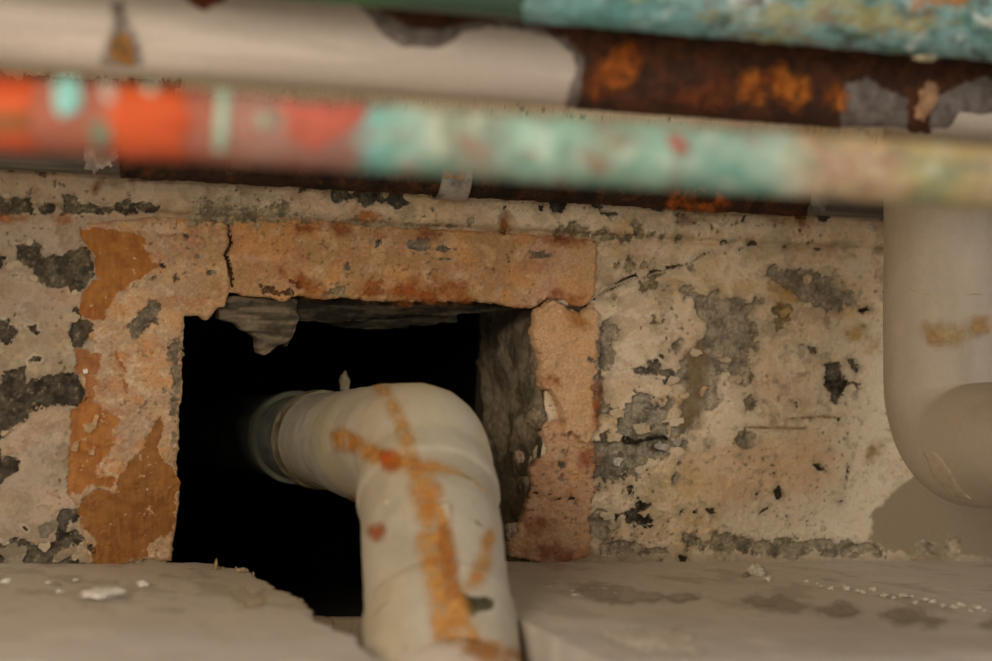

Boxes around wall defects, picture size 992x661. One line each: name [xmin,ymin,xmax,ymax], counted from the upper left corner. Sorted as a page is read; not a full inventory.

rust [377,7,992,134]
peeling [0,238,95,295]
peeling [0,192,160,217]
crack [223,224,234,289]
peeling [183,190,475,261]
peeling [0,313,40,345]
peeling [62,307,97,348]
peeling [125,298,162,341]
spalling [215,279,540,355]
peeling [0,356,87,485]
peeling [587,263,887,562]
peeling [0,508,96,564]